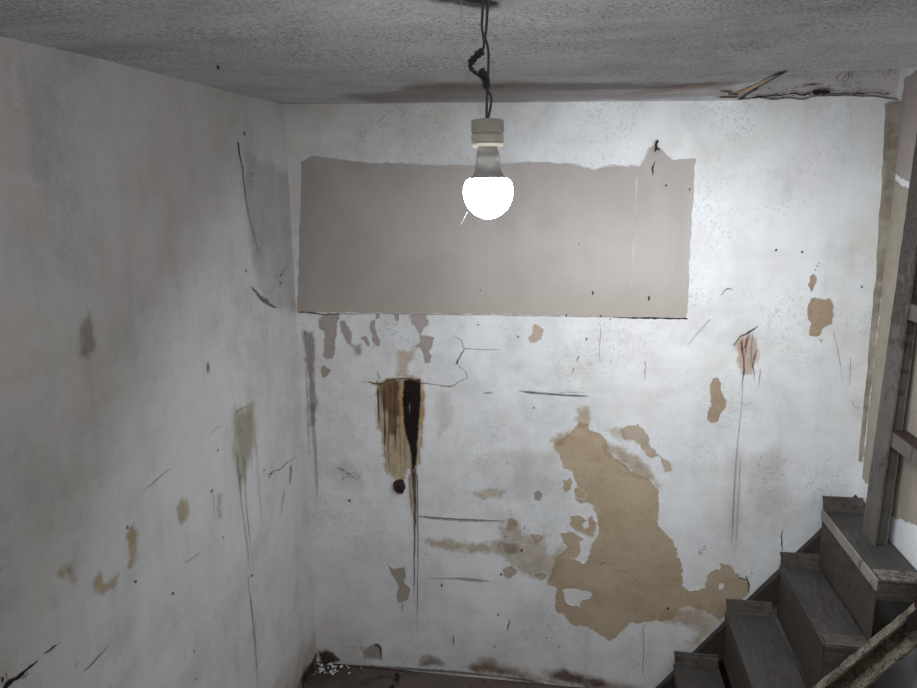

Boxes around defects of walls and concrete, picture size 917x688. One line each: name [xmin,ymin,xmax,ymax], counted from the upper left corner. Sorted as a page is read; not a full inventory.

crack [753,89,890,99]
flaking render [290,146,696,378]
peeling [807,262,835,343]
crack [370,335,500,387]
rust [733,326,760,383]
peeling [707,377,727,423]
rust [376,378,425,607]
peeling [533,409,750,641]
peeling [500,566,519,579]
crack [2,641,61,688]